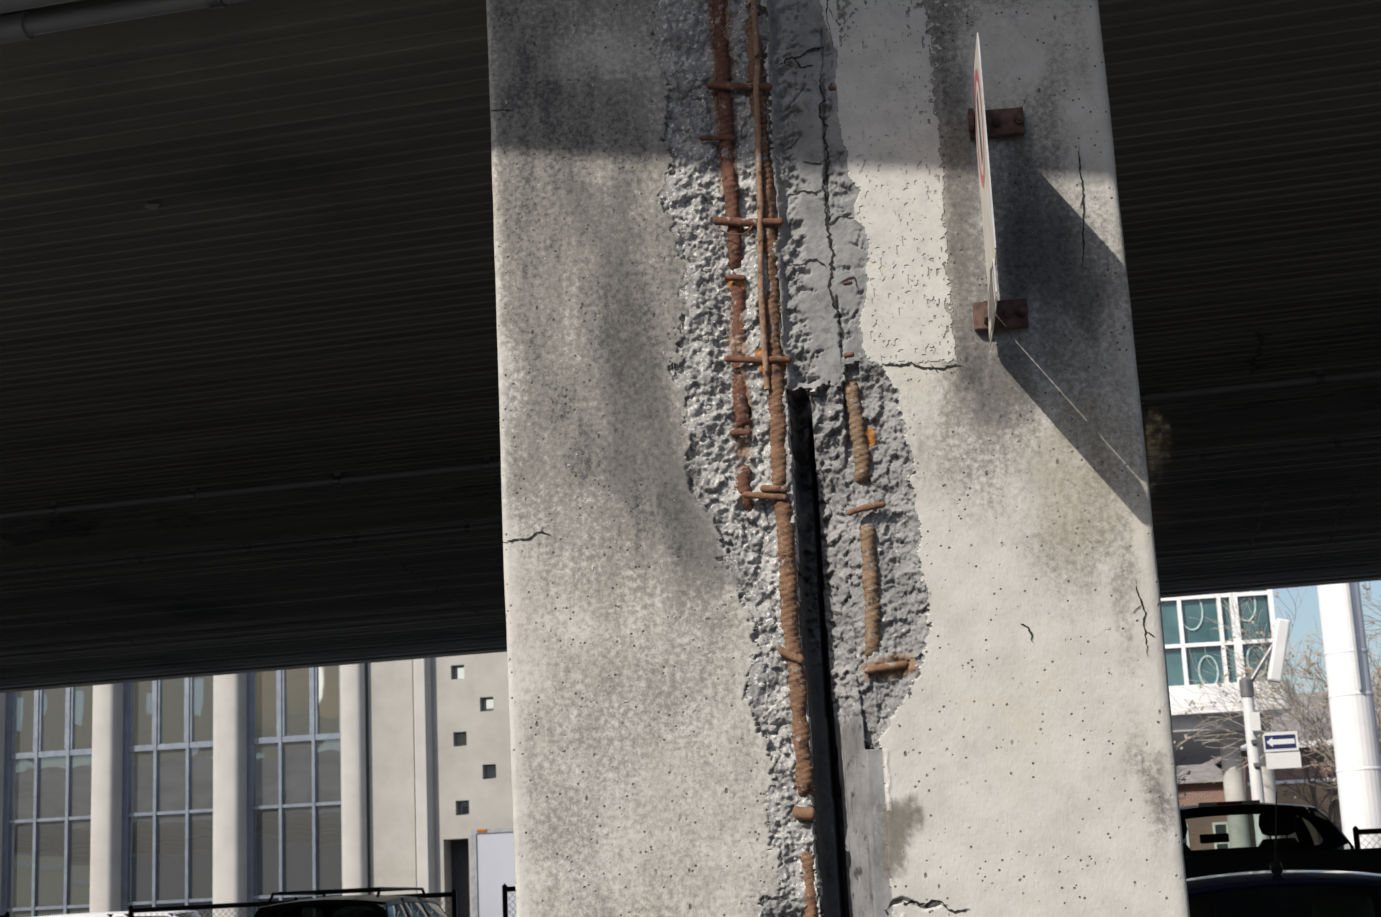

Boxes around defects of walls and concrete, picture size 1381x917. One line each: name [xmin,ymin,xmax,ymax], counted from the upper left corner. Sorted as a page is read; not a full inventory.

peeling [811,0,985,750]
rust [866,427,876,448]
spalling [652,0,823,917]
crack [816,877,824,917]
crack [885,899,968,914]